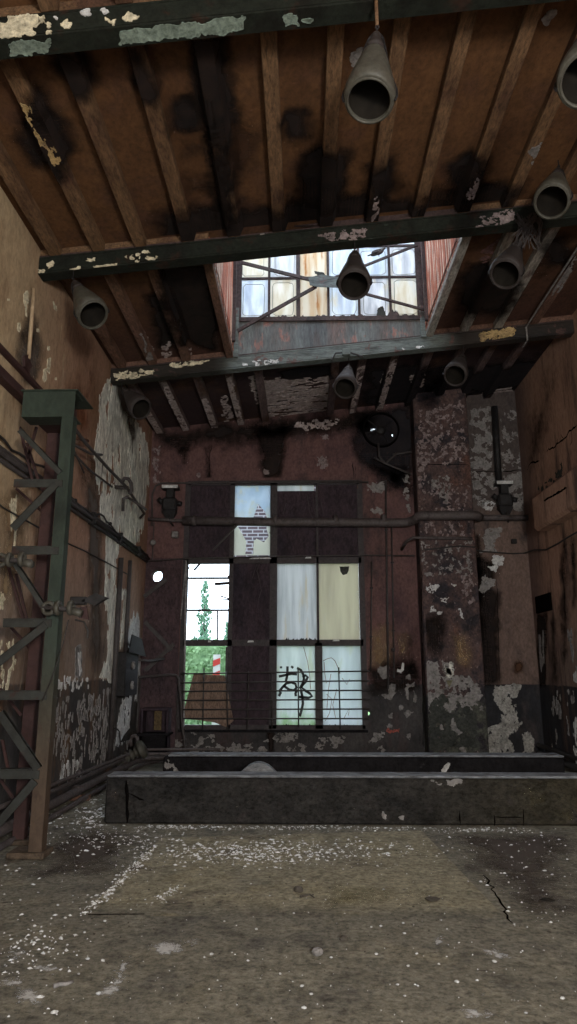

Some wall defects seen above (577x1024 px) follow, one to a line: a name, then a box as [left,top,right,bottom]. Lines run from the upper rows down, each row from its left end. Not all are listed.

peeling [0,7,246,57]
peeling [20,103,61,166]
leakage [15,85,75,181]
leakage [154,36,521,242]
peeling [318,197,380,242]
peeling [478,327,516,342]
leakage [154,353,540,478]
leakage [372,466,413,494]
peeling [403,387,524,619]
peeling [53,333,209,782]
peeling [369,660,535,753]
crack [483,875,513,923]